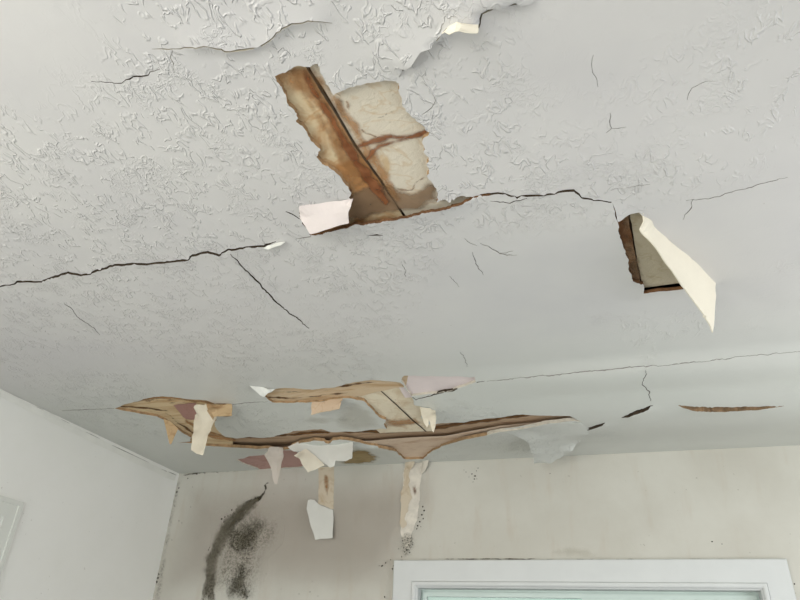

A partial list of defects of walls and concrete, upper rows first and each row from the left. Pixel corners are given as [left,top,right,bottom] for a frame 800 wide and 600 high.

peeling [436,9,493,41]
spalling [275,64,491,236]
crack [490,184,650,204]
crack [684,177,787,217]
crack [0,241,308,328]
spalling [613,206,716,333]
spalling [115,396,235,455]
spalling [237,376,590,549]
crack [490,351,800,431]
damp [204,483,267,600]